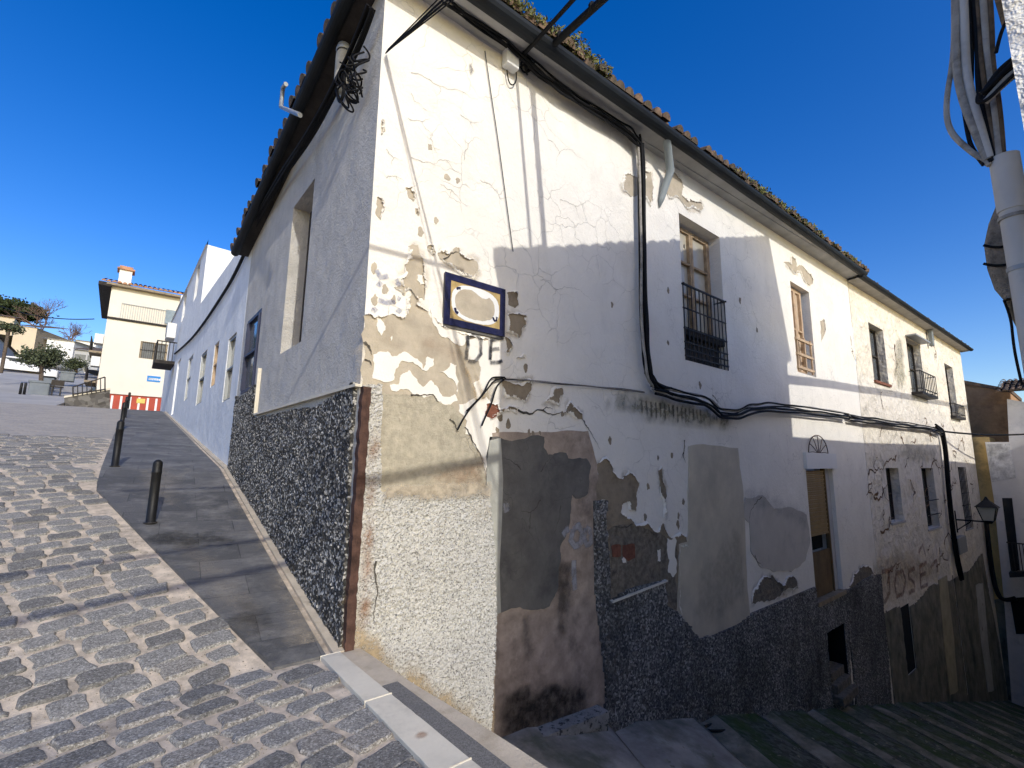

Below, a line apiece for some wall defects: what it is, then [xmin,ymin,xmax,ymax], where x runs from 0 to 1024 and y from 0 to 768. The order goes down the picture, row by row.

crack [386,72,484,205]
peeling [621,161,654,207]
peeling [665,170,704,212]
peeling [784,255,813,286]
peeling [360,185,532,478]
crack [518,407,598,444]
water stain [622,397,729,425]
peeling [596,436,689,613]
peeling [752,575,799,604]
water stain [504,685,584,733]